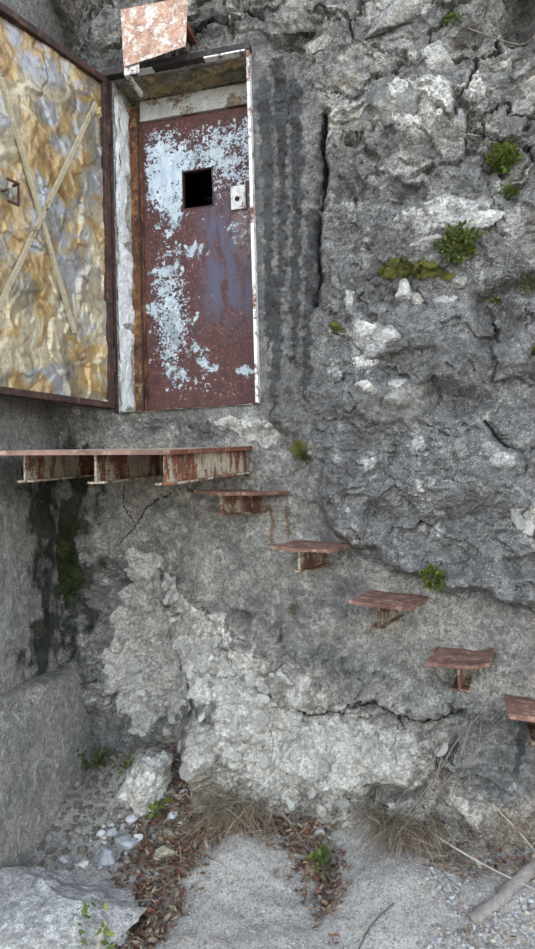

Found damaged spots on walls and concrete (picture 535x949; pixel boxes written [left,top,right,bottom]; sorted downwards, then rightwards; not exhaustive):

peeling [190,132,245,178]
peeling [114,94,219,412]
peeling [235,364,254,378]
damp [63,428,90,450]
damp [16,477,108,682]
crack [299,701,463,740]